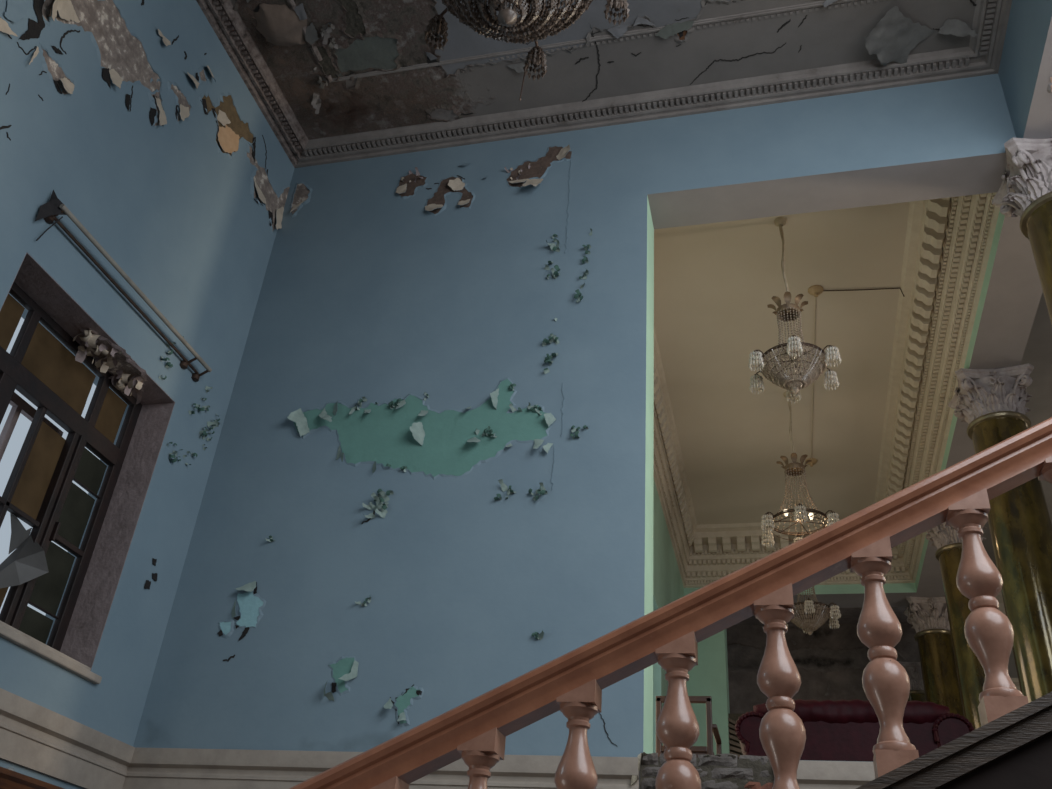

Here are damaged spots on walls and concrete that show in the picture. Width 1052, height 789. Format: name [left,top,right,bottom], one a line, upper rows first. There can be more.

flaking render [294,0,402,114]
crack [575,23,641,102]
crack [690,15,807,85]
peeling [0,0,313,233]
peeling [395,163,476,216]
peeling [505,145,573,190]
peeling [574,228,592,302]
peeling [287,377,556,480]
peeling [361,489,393,524]
peeling [218,581,266,641]
peeling [324,656,359,702]
peeling [384,685,424,727]